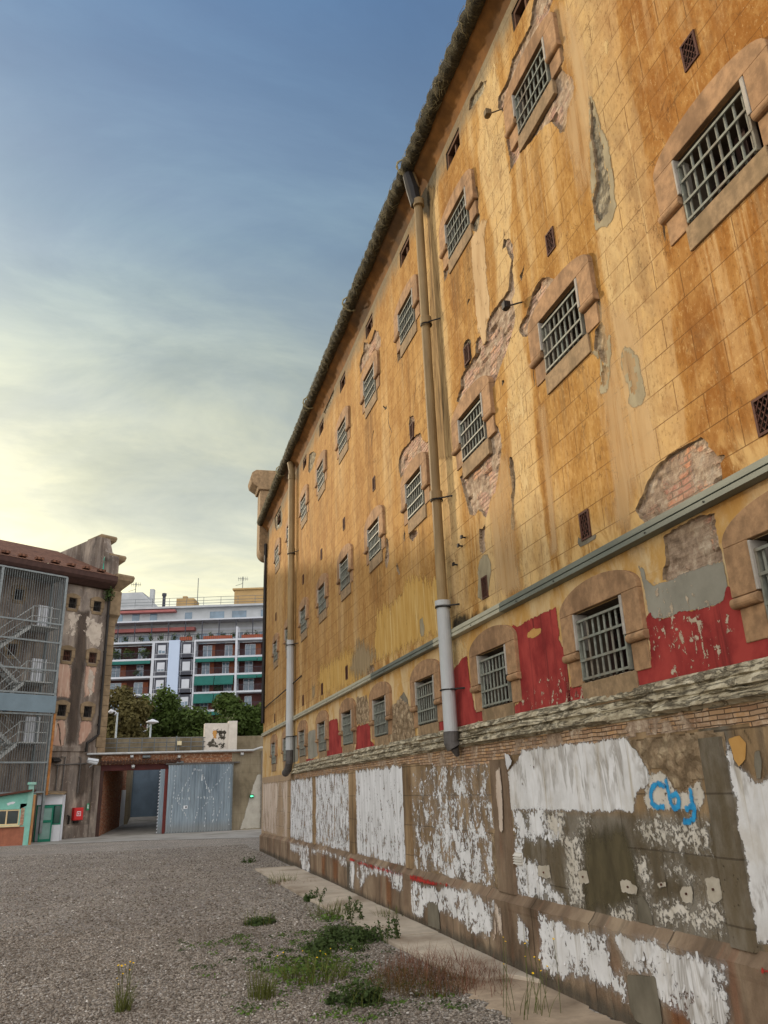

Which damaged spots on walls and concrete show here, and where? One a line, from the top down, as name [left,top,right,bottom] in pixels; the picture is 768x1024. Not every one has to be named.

spalling [498,0,553,112]
spalling [506,46,575,173]
spalling [588,96,616,231]
spalling [592,322,646,408]
spalling [460,426,516,554]
spalling [635,437,725,523]
peeling [512,608,591,714]
peeling [610,513,768,701]
peeling [262,656,768,1024]